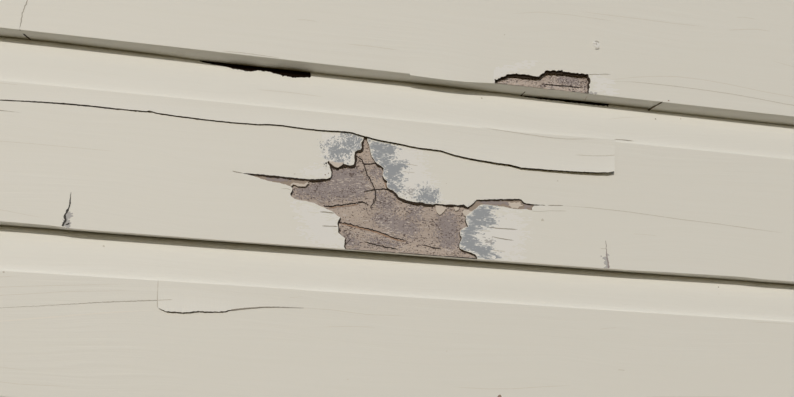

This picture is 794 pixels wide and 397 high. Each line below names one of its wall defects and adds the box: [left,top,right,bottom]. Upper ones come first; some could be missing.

crack [62,194,71,226]